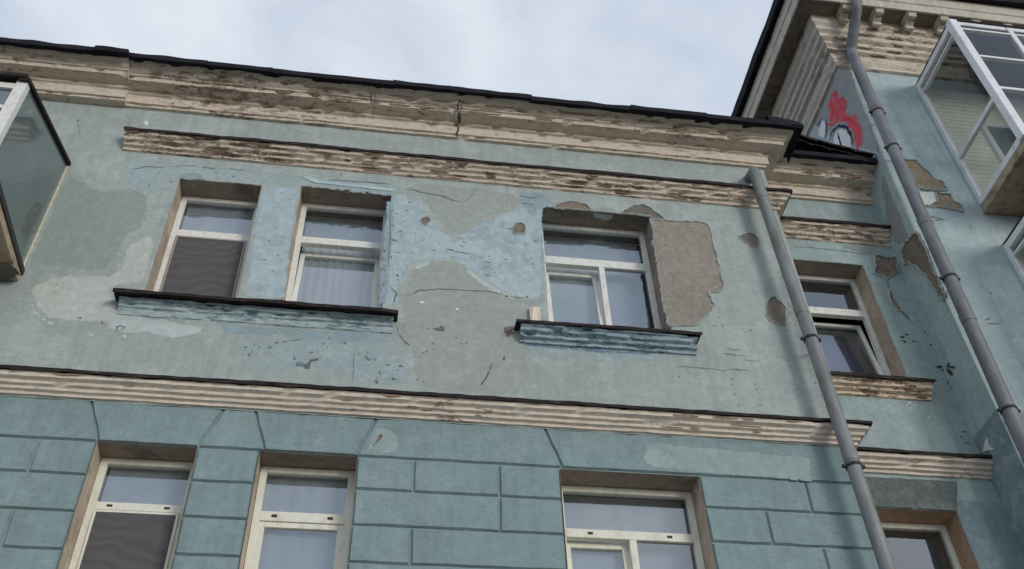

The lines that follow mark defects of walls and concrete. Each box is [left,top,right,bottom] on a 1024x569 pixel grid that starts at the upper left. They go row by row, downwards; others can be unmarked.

crack [455,99,465,137]
peeling [668,182,744,201]
spalling [904,158,964,213]
flaking render [126,142,543,306]
spalling [545,172,725,327]
spalling [798,175,949,309]
spalling [765,296,790,326]
spalling [368,427,399,454]